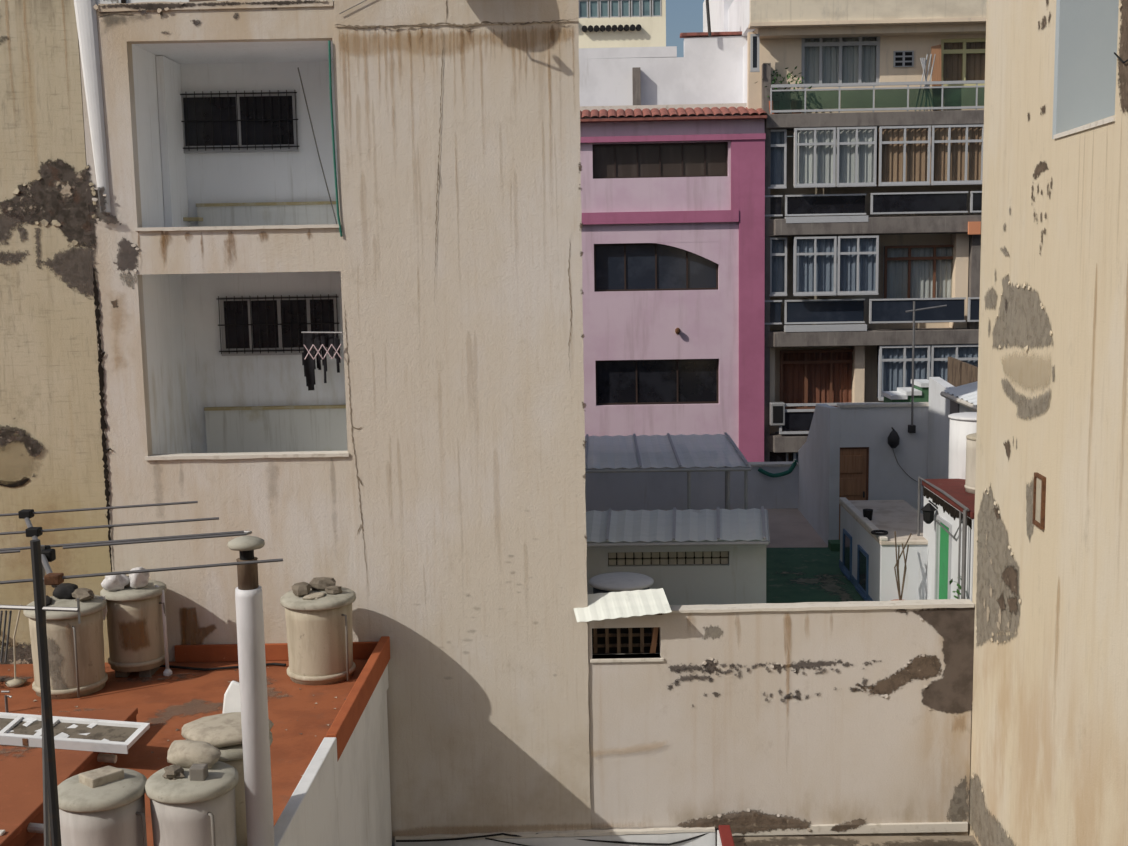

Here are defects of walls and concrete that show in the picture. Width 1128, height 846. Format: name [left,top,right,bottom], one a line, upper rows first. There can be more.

spalling [1118,0,1128,113]
crack [335,0,573,302]
spalling [0,158,139,297]
spalling [984,273,1054,352]
crack [93,268,113,572]
spalling [923,483,1021,646]
spalling [763,690,819,702]
spalling [668,654,941,698]
spalling [947,773,1016,846]